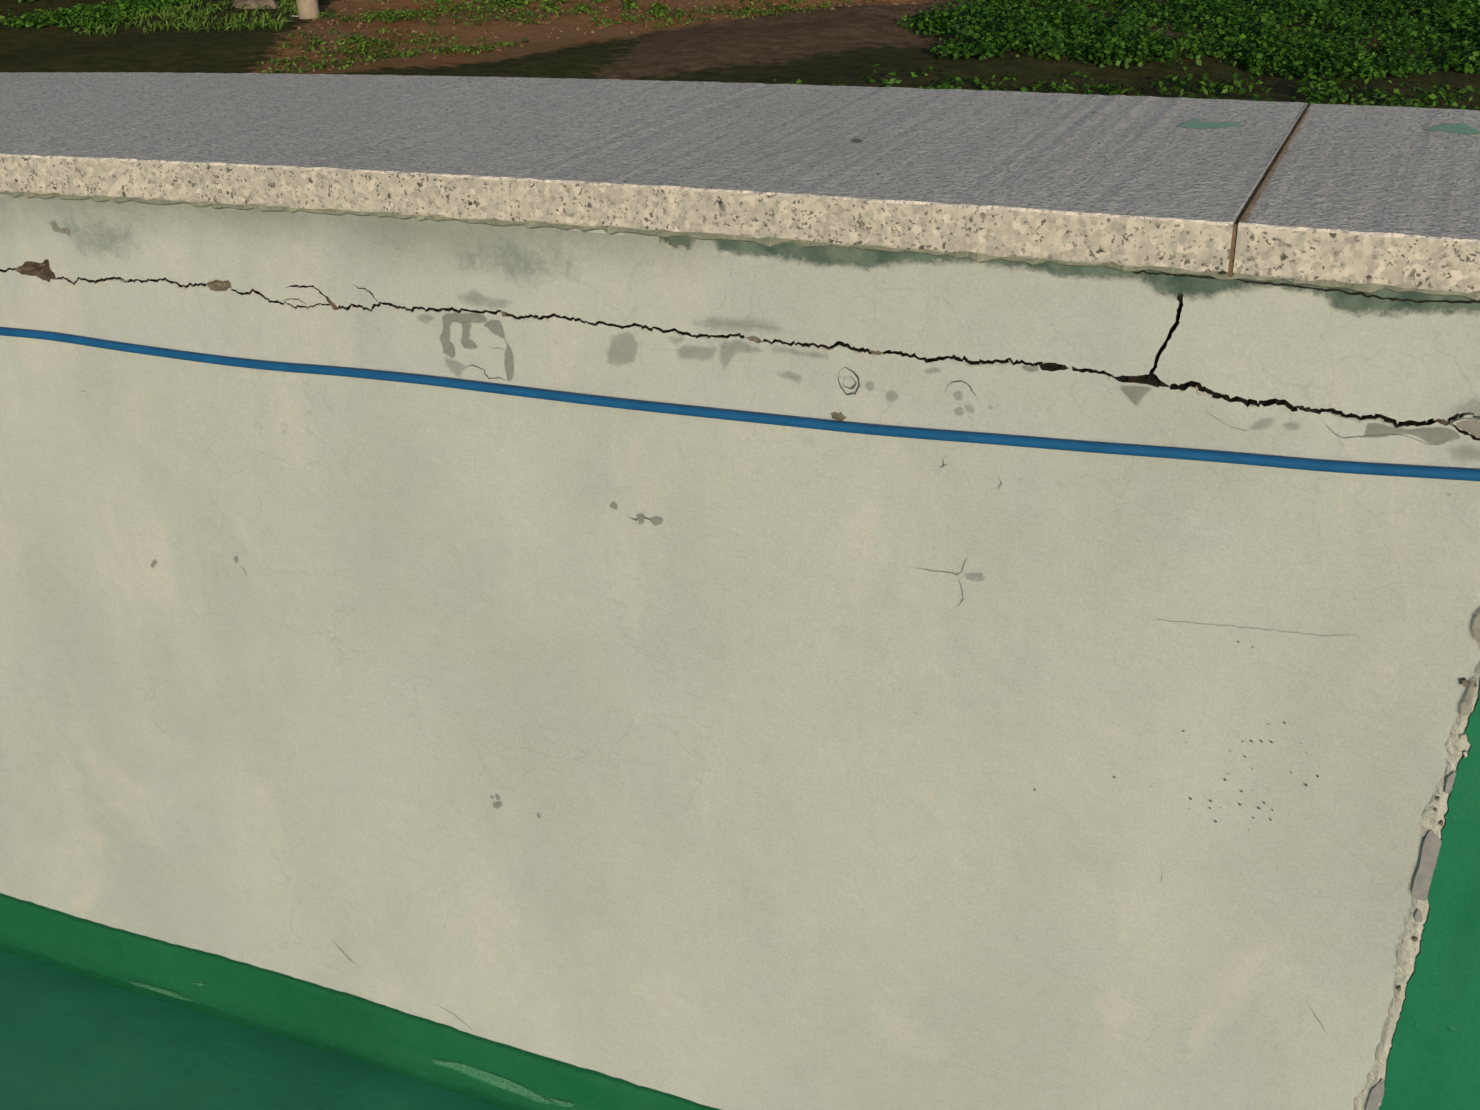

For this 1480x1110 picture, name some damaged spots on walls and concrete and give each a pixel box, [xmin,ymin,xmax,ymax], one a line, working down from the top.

spalling [14,259,57,282]
crack [57,276,1113,381]
crack [1116,269,1480,445]
peeling [1366,418,1480,444]
peeling [1353,608,1480,1110]